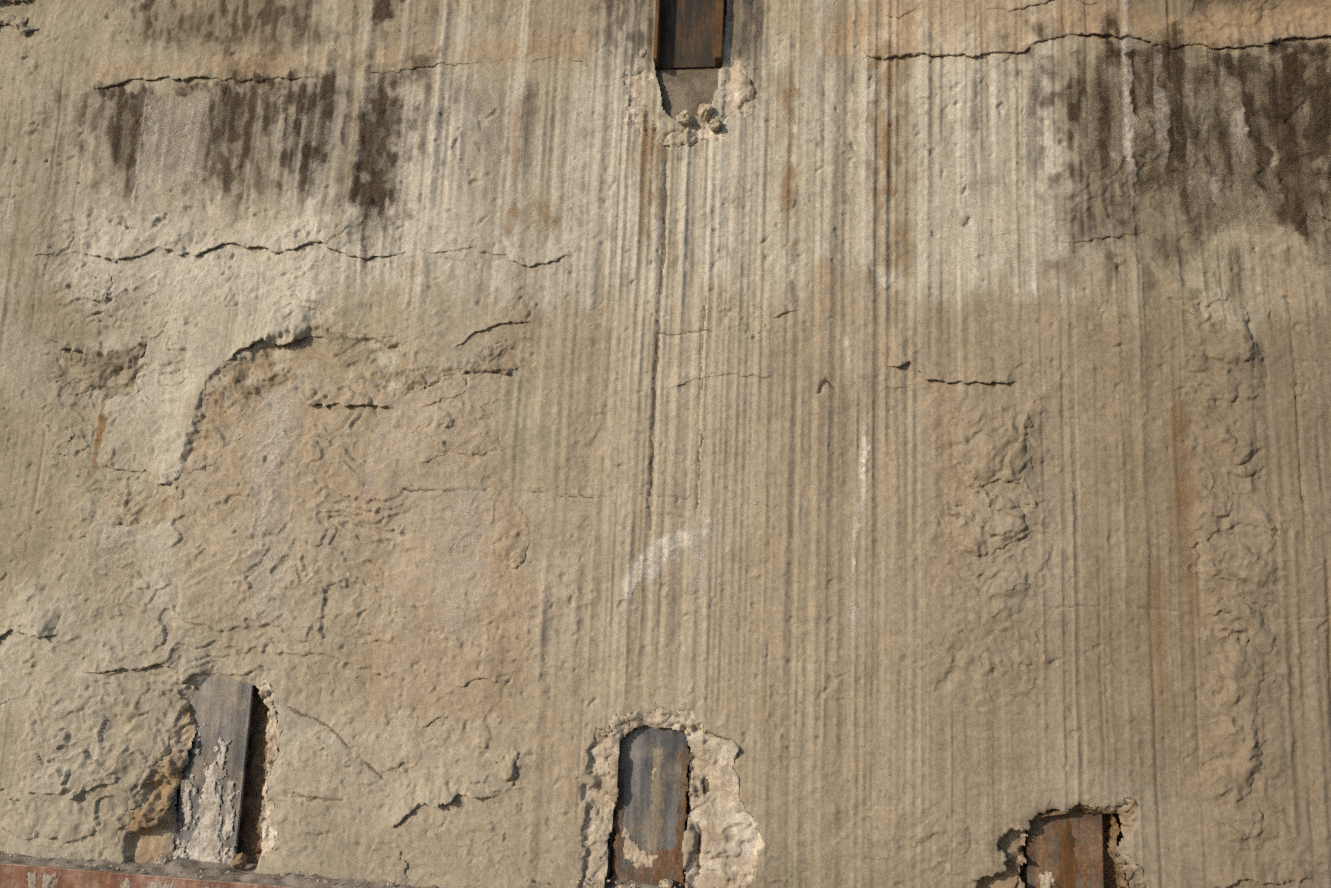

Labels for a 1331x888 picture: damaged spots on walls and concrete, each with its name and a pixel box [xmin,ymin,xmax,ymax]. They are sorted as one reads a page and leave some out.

leakage [77,59,427,237]
spalling [614,49,756,149]
peeling [861,0,1331,61]
leakage [1029,18,1331,239]
spalling [75,621,299,864]
spalling [578,700,764,888]
spalling [973,822,1028,888]
spalling [1097,798,1145,888]